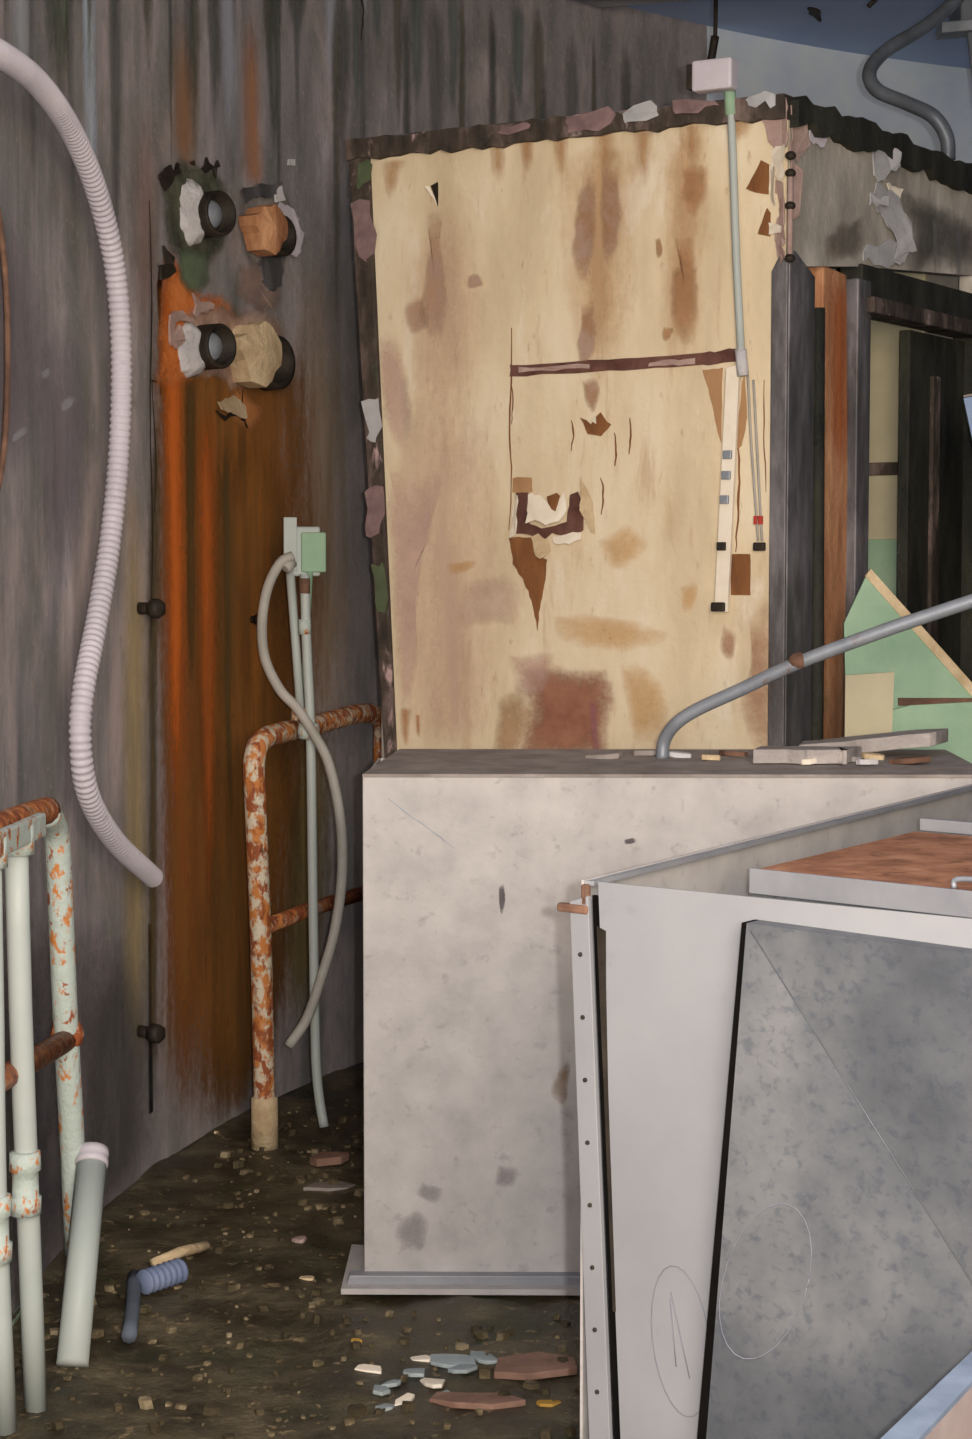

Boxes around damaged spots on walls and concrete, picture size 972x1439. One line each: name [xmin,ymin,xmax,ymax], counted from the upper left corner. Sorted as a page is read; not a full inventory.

water stain [5,0,120,197]
spalling [158,157,304,349]
water stain [265,0,305,169]
peeling [498,122,531,135]
peeling [565,99,718,133]
peeling [862,148,917,268]
corrosion [149,264,319,1104]
water stain [500,663,610,749]
water stain [31,955,53,1046]
water stain [75,872,142,1203]
water stain [35,1061,63,1264]
water stain [9,1216,19,1295]